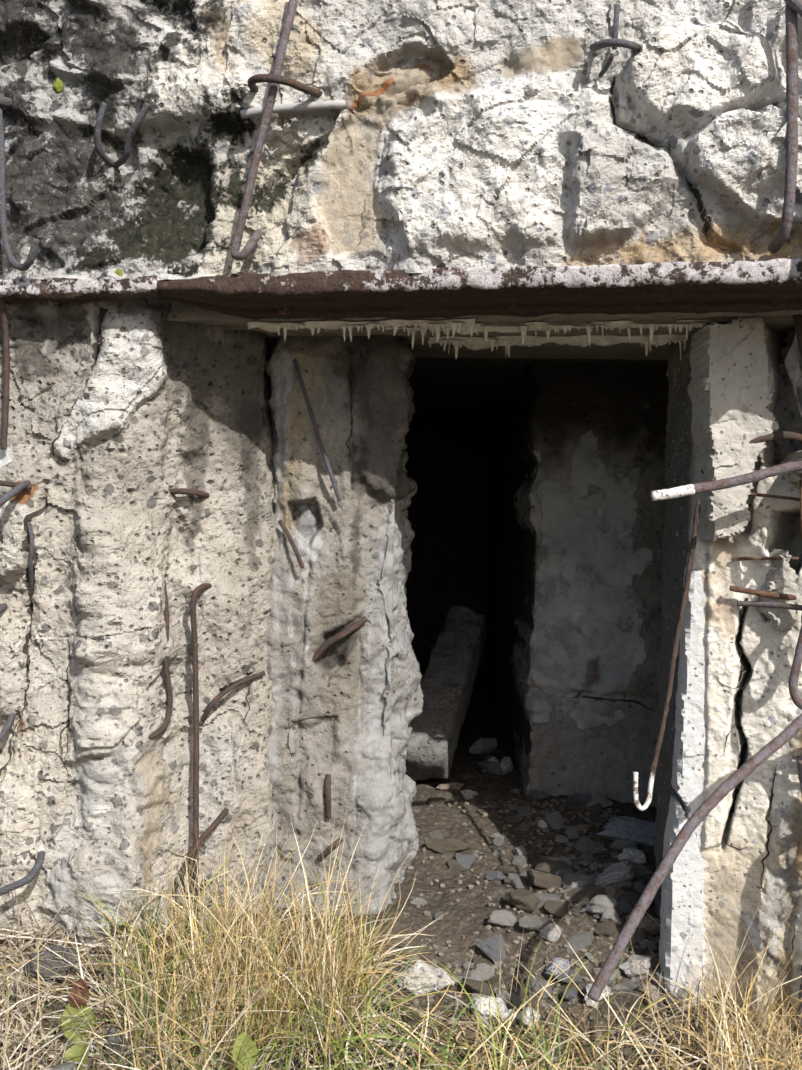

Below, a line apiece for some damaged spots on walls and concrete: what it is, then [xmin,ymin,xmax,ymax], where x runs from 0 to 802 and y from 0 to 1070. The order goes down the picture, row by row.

leakage [11,56,31,91]
leakage [152,32,182,79]
spalling [349,53,450,110]
crack [609,76,670,151]
crack [685,177,731,252]
leakage [247,318,708,637]
spalling [317,622,357,670]
leakage [267,638,309,784]
crack [714,597,777,893]
corrosion [785,796,802,928]
corrosion [772,950,795,1043]